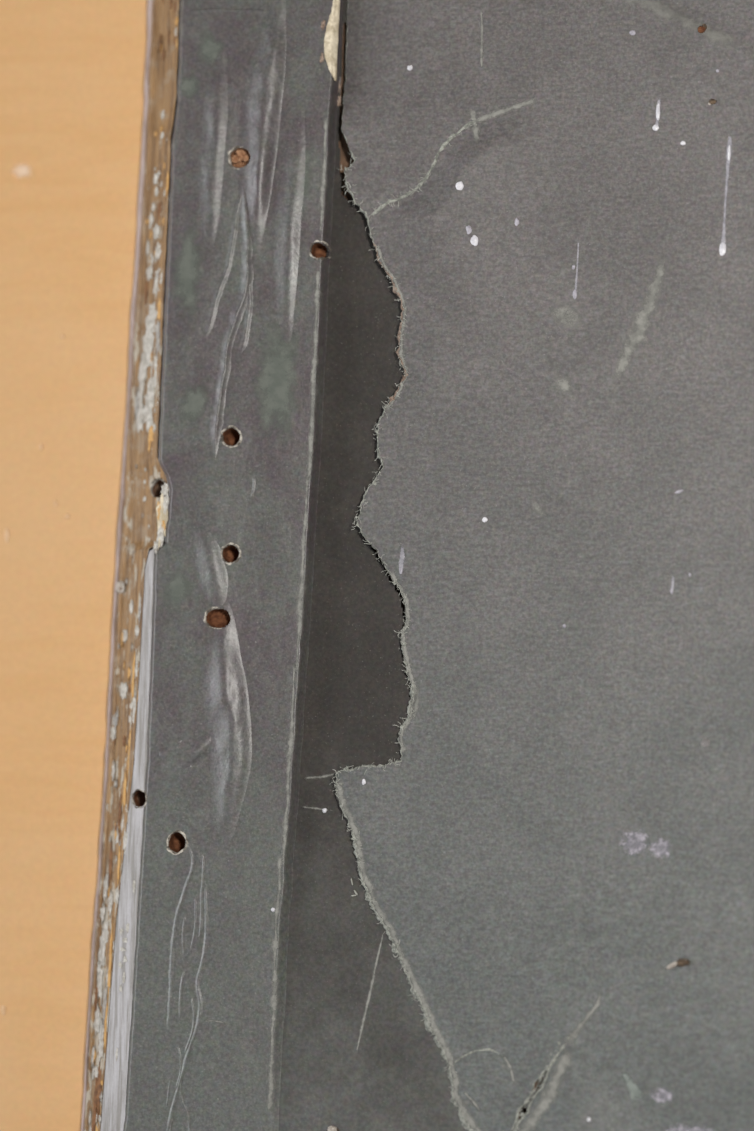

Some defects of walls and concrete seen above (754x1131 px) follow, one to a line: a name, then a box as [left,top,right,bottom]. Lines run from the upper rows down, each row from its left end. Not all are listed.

peeling [134,162,169,451]
peeling [136,464,170,554]
peeling [89,599,141,1131]
water stain [622,831,670,857]
crack [453,994,601,1131]
water stain [651,1088,672,1103]